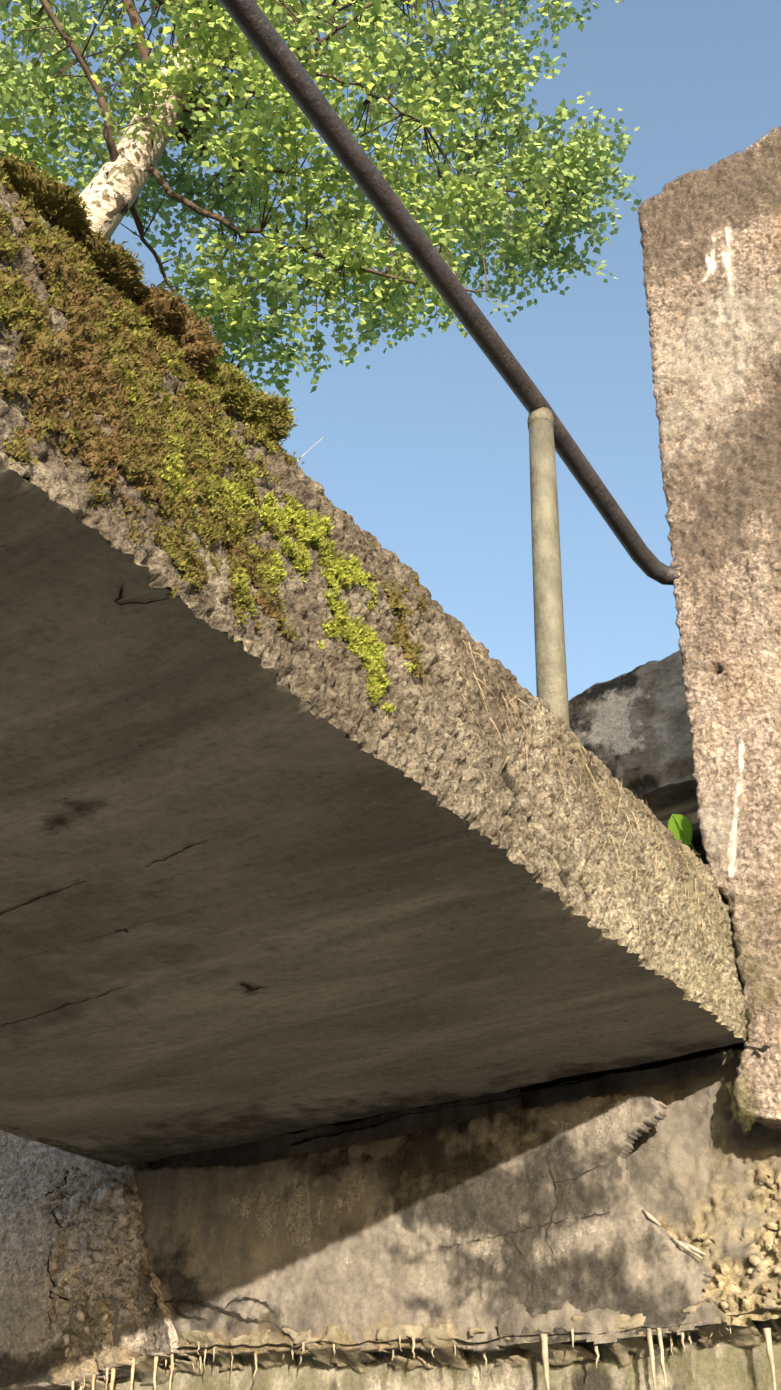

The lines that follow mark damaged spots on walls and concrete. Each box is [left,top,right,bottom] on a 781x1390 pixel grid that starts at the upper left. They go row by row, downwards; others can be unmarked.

damp [59,1096,471,1166]
spalling [498,1049,781,1346]
damp [130,1095,781,1390]
damp [0,1302,63,1388]
damp [74,1378,120,1390]